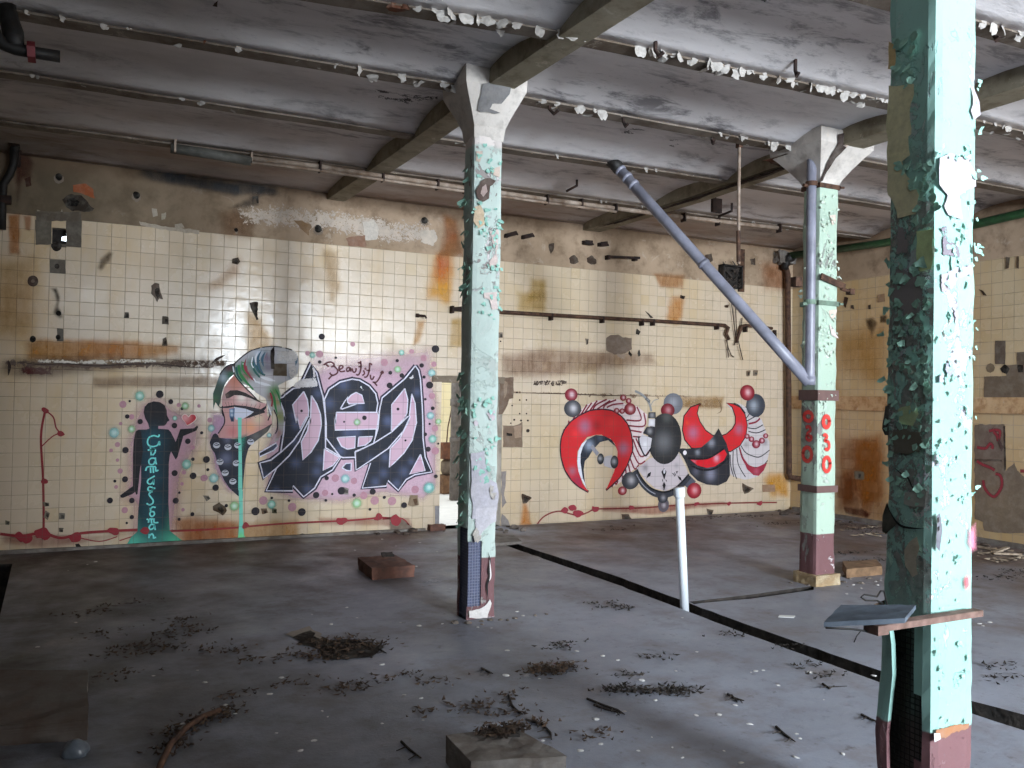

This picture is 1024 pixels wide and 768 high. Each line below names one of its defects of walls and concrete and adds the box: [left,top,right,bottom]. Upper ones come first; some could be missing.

peeling [386,2,522,37]
peeling [535,25,586,42]
peeling [357,65,379,83]
peeling [398,73,427,87]
spalling [478,82,511,114]
peeling [574,105,608,121]
peeling [35,173,95,274]
peeling [234,204,437,247]
spalling [455,143,504,271]
peeling [457,262,471,305]
peeling [635,31,1024,534]
spalling [469,600,492,619]